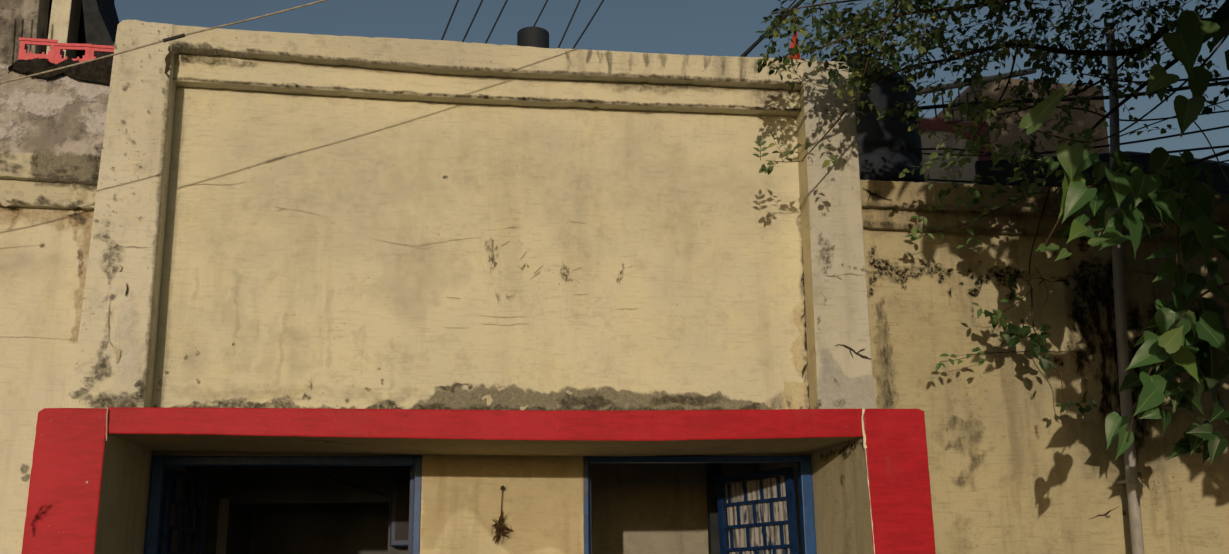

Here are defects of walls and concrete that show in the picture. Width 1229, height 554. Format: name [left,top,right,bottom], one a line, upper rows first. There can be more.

water stain [868,248,1030,316]
spalling [73,341,168,408]
spalling [174,383,312,408]
spalling [322,380,771,411]
water stain [1052,238,1195,473]